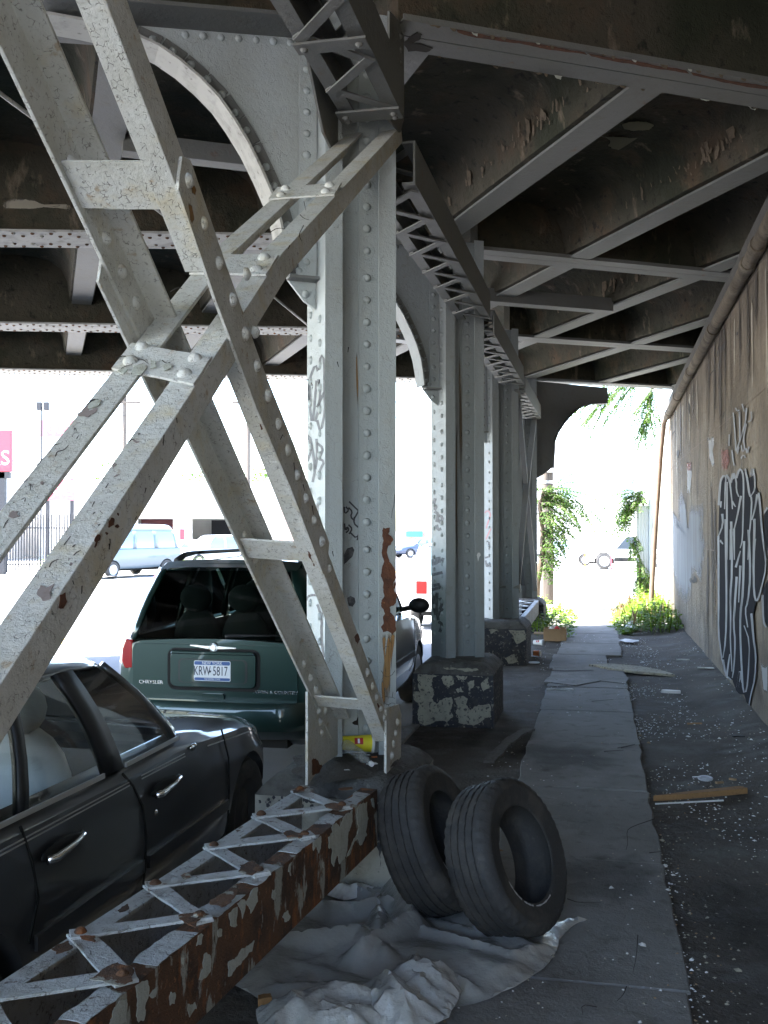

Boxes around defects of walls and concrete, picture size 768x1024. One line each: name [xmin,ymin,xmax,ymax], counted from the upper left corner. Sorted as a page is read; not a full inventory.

corrosion [377,527,397,708]
peeling [413,667,491,726]
corrosion [283,830,303,839]
peeling [313,798,375,868]
corrosion [238,860,259,876]
corrosion [178,886,239,928]
peeling [217,887,258,937]
corrosion [51,935,96,954]
corrosion [89,962,134,986]
peeling [196,933,211,980]
peeling [228,941,254,977]
peeling [109,980,176,1024]